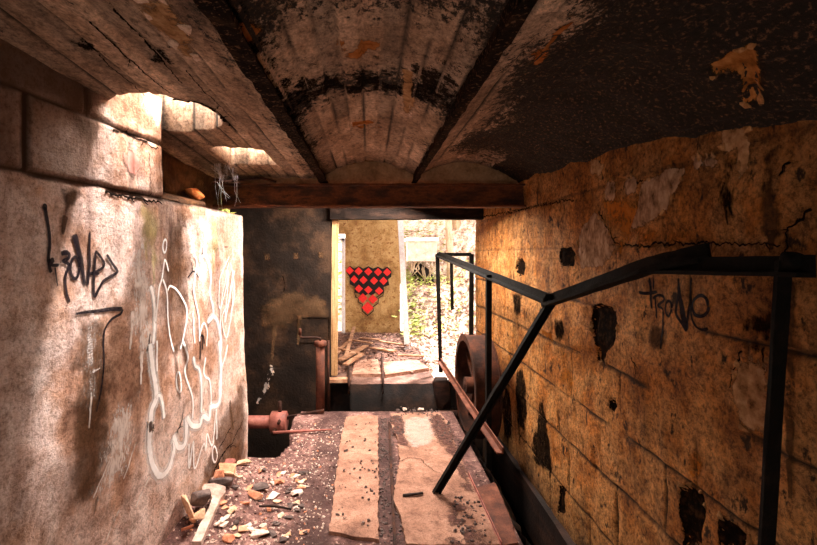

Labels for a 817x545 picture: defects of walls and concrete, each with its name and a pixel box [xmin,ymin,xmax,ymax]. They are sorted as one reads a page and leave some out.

spalling [709,43,764,109]
crack [483,199,574,218]
flaking render [590,126,753,232]
crack [599,208,812,252]
damp [263,294,325,359]
damp [502,368,552,478]